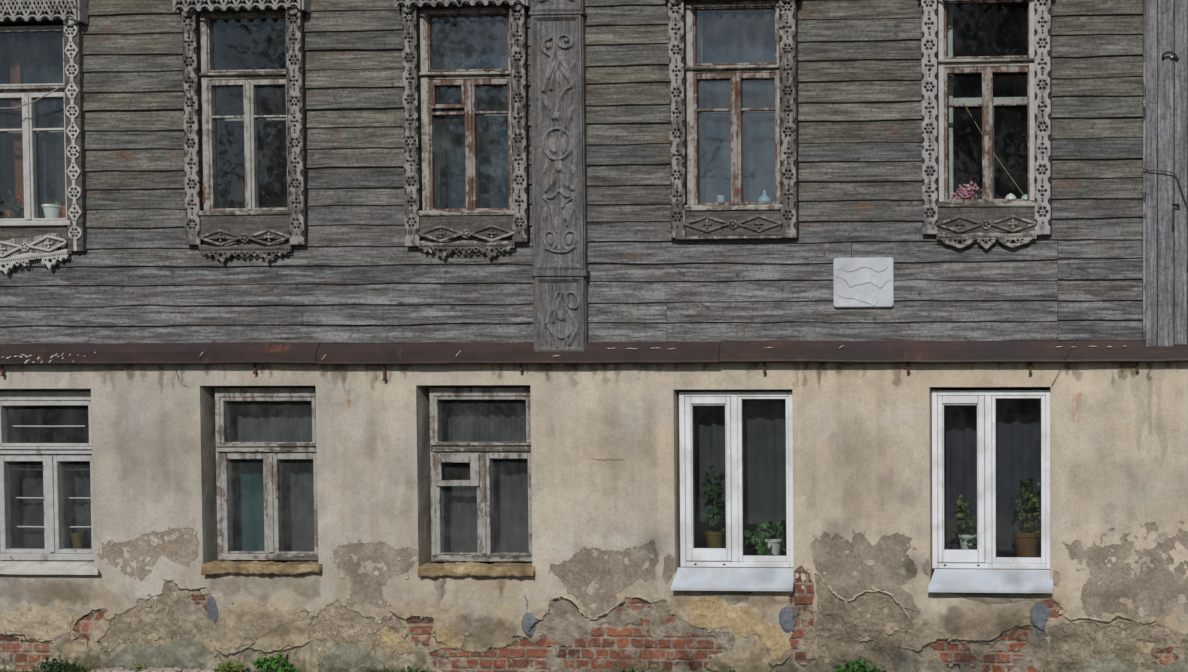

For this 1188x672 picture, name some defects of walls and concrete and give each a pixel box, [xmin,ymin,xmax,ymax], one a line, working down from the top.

peeling [97,526,199,581]
flaking render [0,631,60,670]
flaking render [69,580,215,656]
flaking render [301,538,735,672]
flaking render [712,591,752,604]
flaking render [787,527,930,672]
peeling [931,519,1188,672]